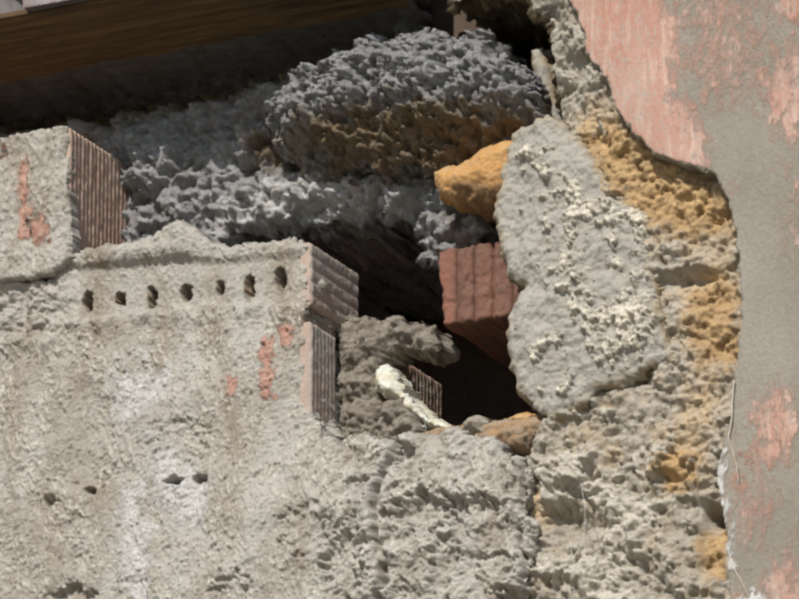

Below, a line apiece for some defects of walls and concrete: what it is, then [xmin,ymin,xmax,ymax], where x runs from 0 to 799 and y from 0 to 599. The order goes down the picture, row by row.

spalling [446,0,799,599]